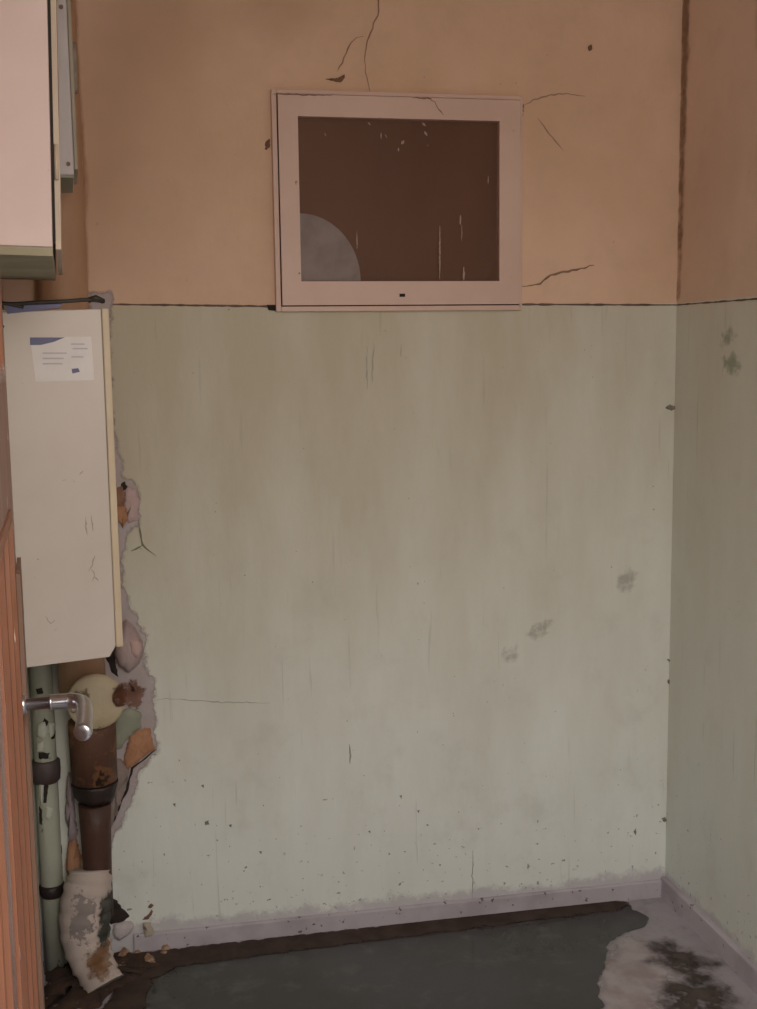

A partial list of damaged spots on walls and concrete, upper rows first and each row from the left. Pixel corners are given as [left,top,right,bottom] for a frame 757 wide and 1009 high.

crack [338,0,379,90]
crack [275,90,333,98]
damp [678,0,689,248]
flaking render [88,290,114,325]
crack [522,265,594,287]
flaking render [105,432,157,843]
damp [598,937,731,1009]